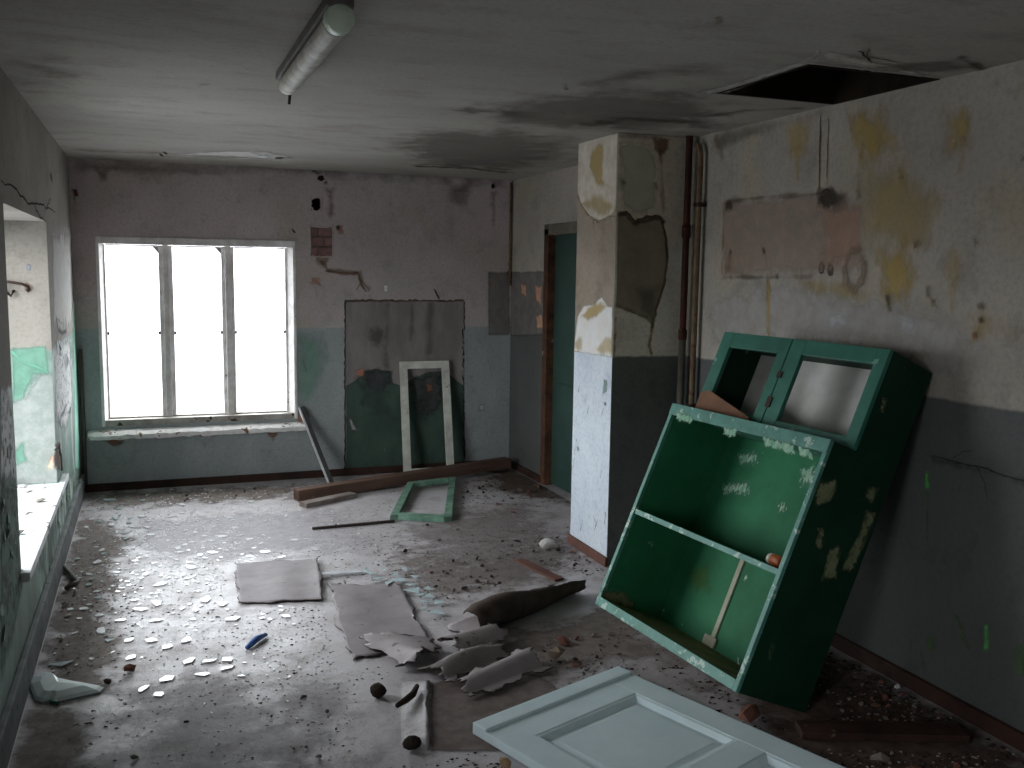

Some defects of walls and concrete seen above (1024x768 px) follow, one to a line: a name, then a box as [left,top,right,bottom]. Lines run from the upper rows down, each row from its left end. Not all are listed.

leakage [504,93,740,128]
leakage [407,134,553,173]
crack [1,180,54,222]
spalling [309,225,334,263]
spalling [574,133,669,357]
flaking render [0,235,80,671]
crack [934,450,1024,498]